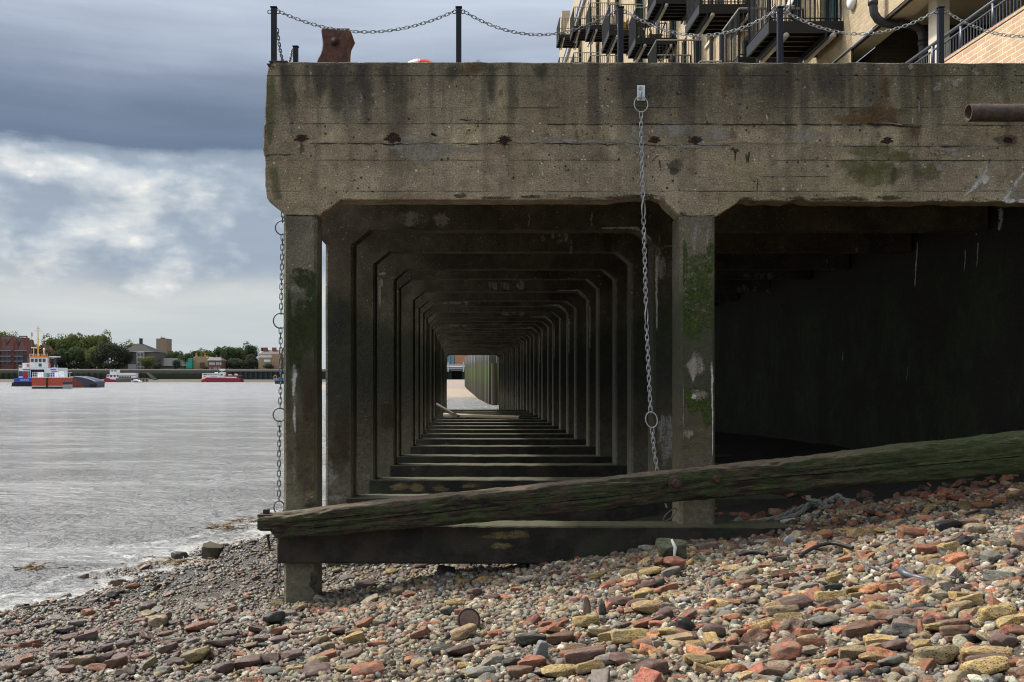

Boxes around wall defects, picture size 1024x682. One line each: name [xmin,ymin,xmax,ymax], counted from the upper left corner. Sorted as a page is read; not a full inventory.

water stain [998,172,1024,230]
water stain [683,354,714,460]